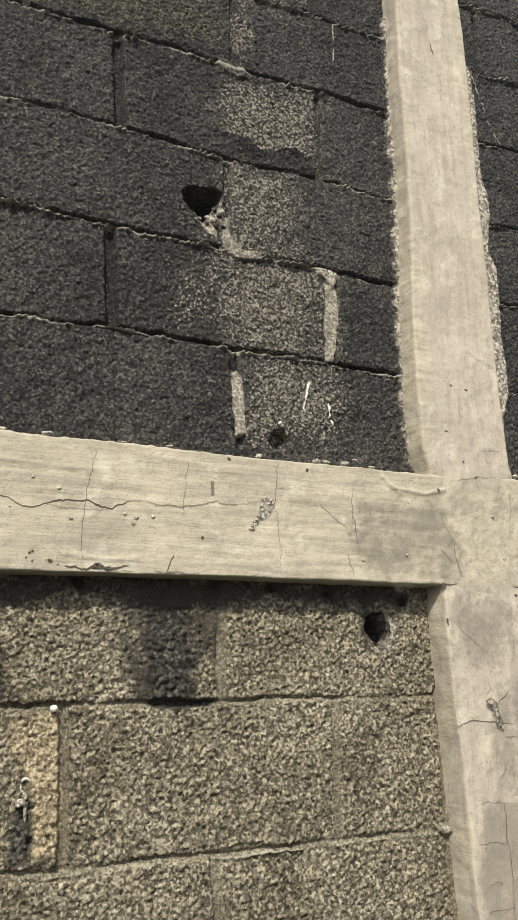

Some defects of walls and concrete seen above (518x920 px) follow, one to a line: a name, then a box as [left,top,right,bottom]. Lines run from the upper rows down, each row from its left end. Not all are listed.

crack [0,452,282,569]
crack [154,555,207,575]
damp [0,575,408,710]
crack [447,682,518,738]
crack [479,802,515,915]